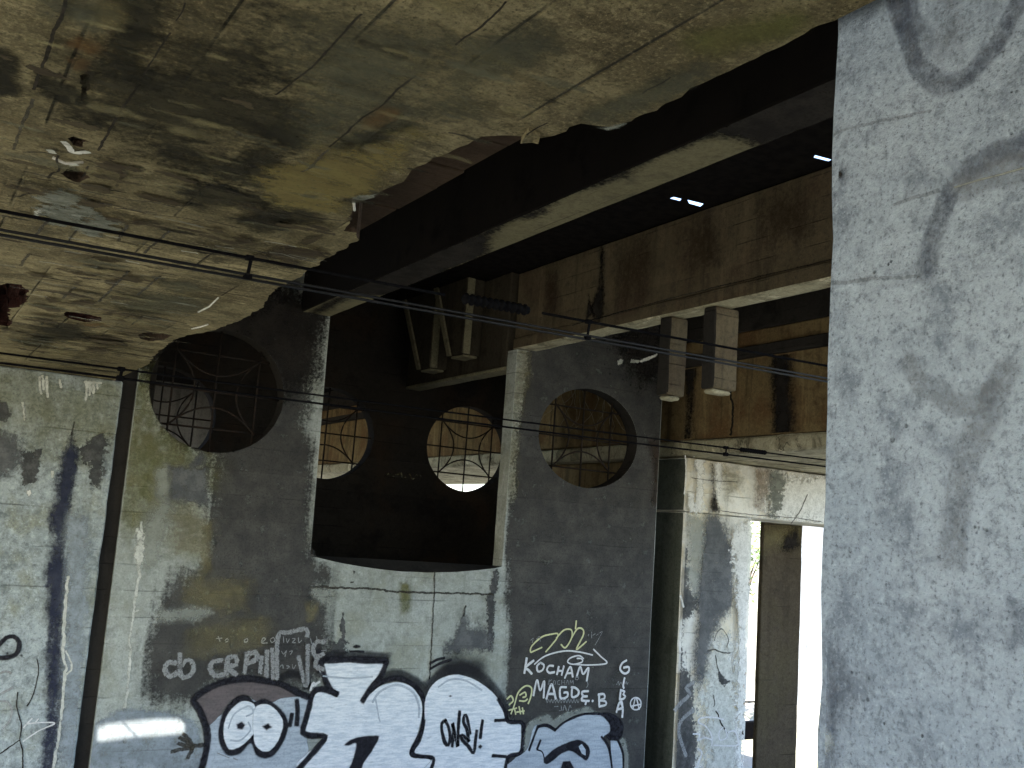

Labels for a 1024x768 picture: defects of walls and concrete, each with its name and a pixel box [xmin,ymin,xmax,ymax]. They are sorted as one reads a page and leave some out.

peeling [25,64,148,129]
leakage [0,0,559,262]
leakage [13,237,205,349]
peeling [0,118,345,377]
spalling [351,194,376,211]
leakage [586,247,605,322]
crack [572,259,831,326]
leakage [676,455,826,768]